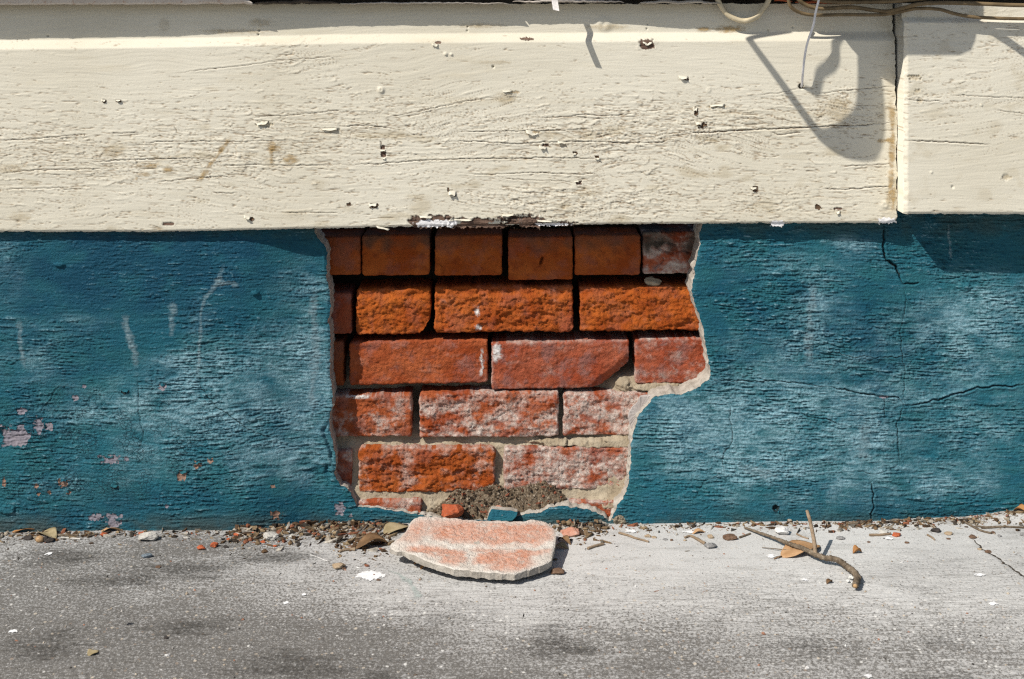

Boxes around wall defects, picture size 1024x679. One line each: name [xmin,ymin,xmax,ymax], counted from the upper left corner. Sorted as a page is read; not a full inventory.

peeling [407,213,577,229]
peeling [0,407,53,447]
spalling [314,228,441,517]
spalling [516,223,711,521]
crack [695,230,1015,519]